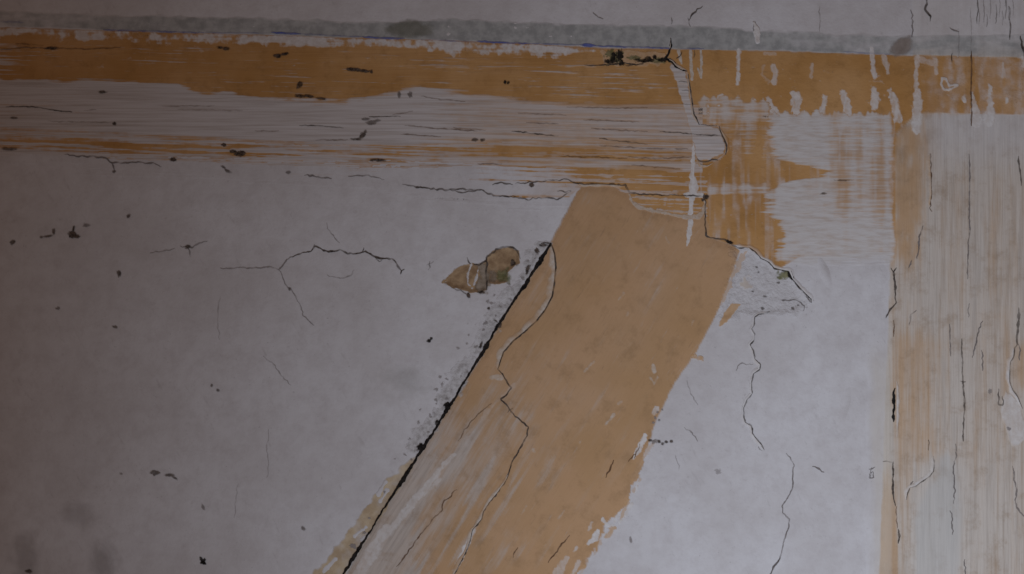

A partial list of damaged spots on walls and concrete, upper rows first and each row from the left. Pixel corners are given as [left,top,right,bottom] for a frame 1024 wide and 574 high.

crack [221,246,405,324]
peeling [0,21,1009,324]
crack [404,138,814,303]
crack [886,154,932,337]
crack [965,161,973,274]
spalling [311,240,553,574]
crack [343,242,557,574]
peeling [552,479,639,574]
peeling [632,405,673,460]
crack [736,311,769,451]
crack [771,456,822,574]
crack [892,307,1022,544]